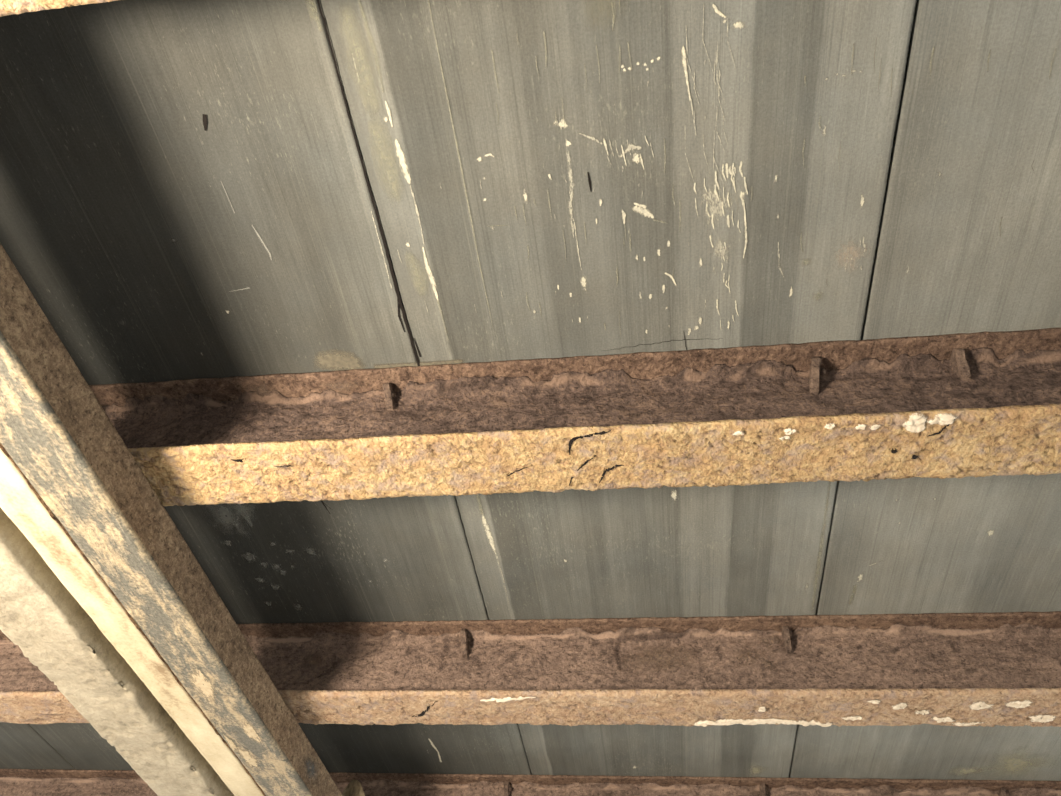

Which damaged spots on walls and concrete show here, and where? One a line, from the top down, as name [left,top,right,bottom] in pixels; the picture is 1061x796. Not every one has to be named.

peeling [566,133,654,237]
peeling [622,203,665,224]
peeling [694,161,748,327]
crack [568,429,624,486]
rust [867,700,1056,726]